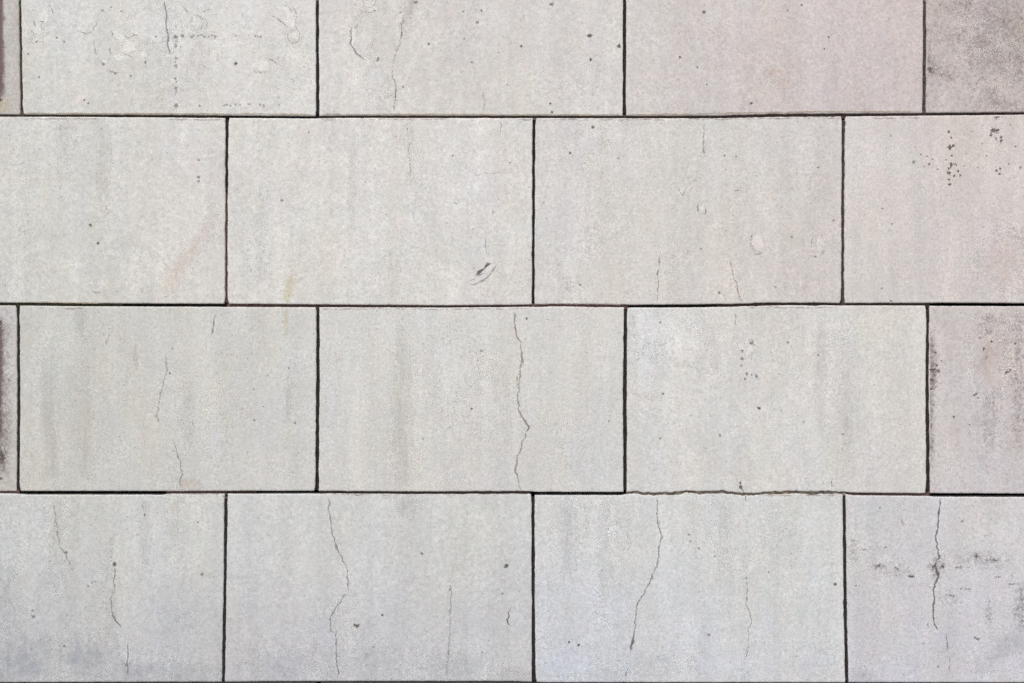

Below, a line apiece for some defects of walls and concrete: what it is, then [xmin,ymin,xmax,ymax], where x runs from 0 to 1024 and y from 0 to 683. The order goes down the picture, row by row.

crack [514,314,530,490]
crack [328,504,349,675]
crack [625,481,841,675]
crack [927,501,950,667]